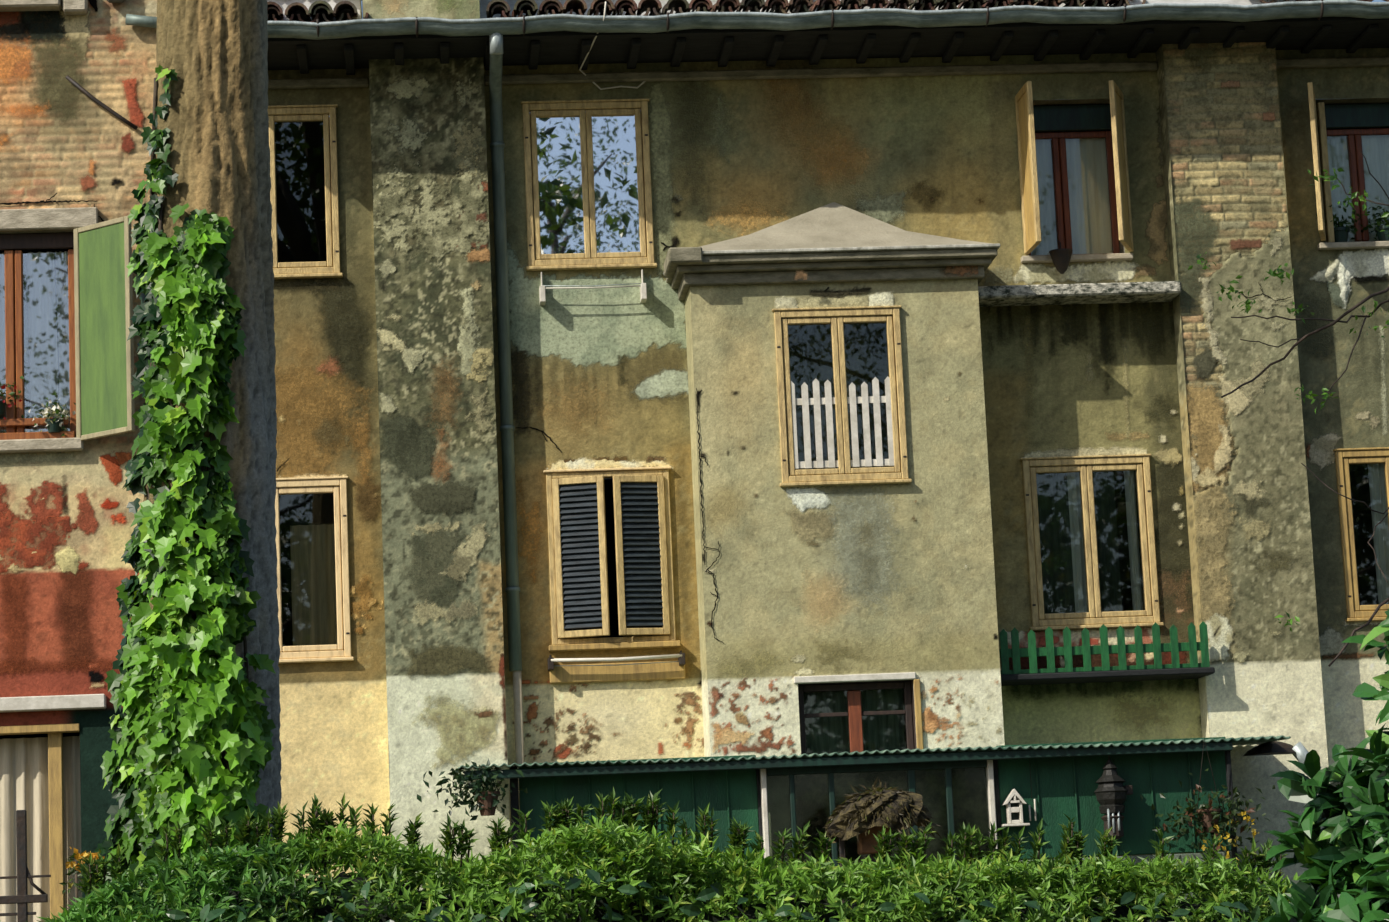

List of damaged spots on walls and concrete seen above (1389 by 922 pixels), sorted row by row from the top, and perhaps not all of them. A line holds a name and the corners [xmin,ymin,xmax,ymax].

peeling [1310,248,1389,308]
water stain [988,300,1177,437]
spalling [985,42,1293,662]
peeling [0,452,132,574]
water stain [379,414,490,624]
crack [696,388,722,642]
peeling [785,483,904,545]
water stain [1155,452,1194,617]
peeling [525,683,616,761]
peeling [658,678,796,755]
peeling [921,678,989,746]